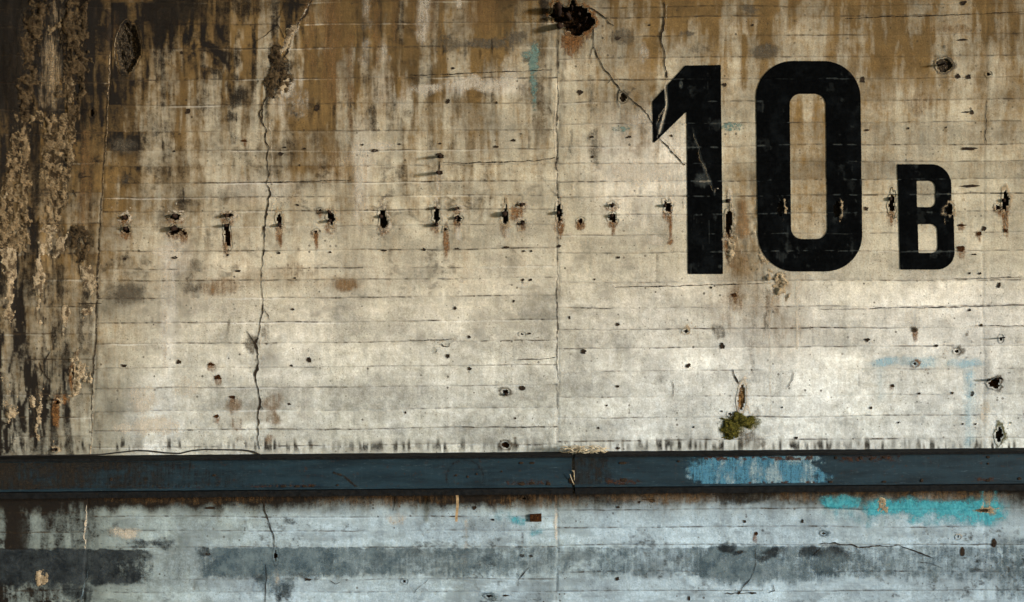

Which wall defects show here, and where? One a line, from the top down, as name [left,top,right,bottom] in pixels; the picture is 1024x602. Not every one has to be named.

spalling [114,19,143,76]
spalling [546,0,599,53]
water stain [227,51,248,138]
water stain [419,74,508,91]
crack [558,0,713,191]
flaking render [0,0,98,336]
crack [210,1,351,449]
water stain [108,283,143,304]
flaking render [0,349,93,442]
spalling [987,372,1010,392]
spalling [995,420,1012,445]